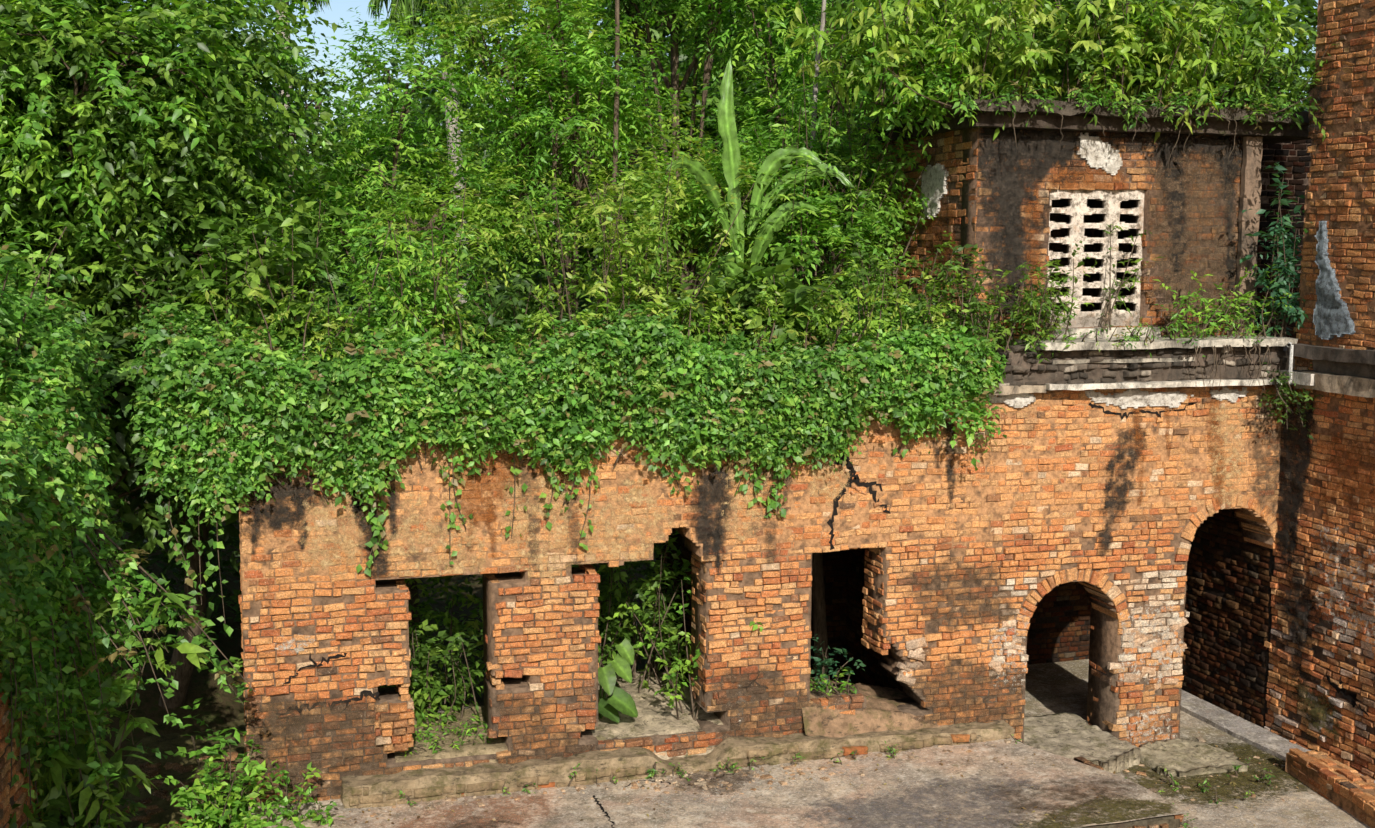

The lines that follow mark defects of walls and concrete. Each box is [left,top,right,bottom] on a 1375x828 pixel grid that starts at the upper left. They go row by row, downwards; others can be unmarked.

flaking render [1076,133,1123,175]
flaking render [919,164,955,265]
damp [975,127,1254,329]
flaking render [1313,221,1355,340]
crack [827,451,890,550]